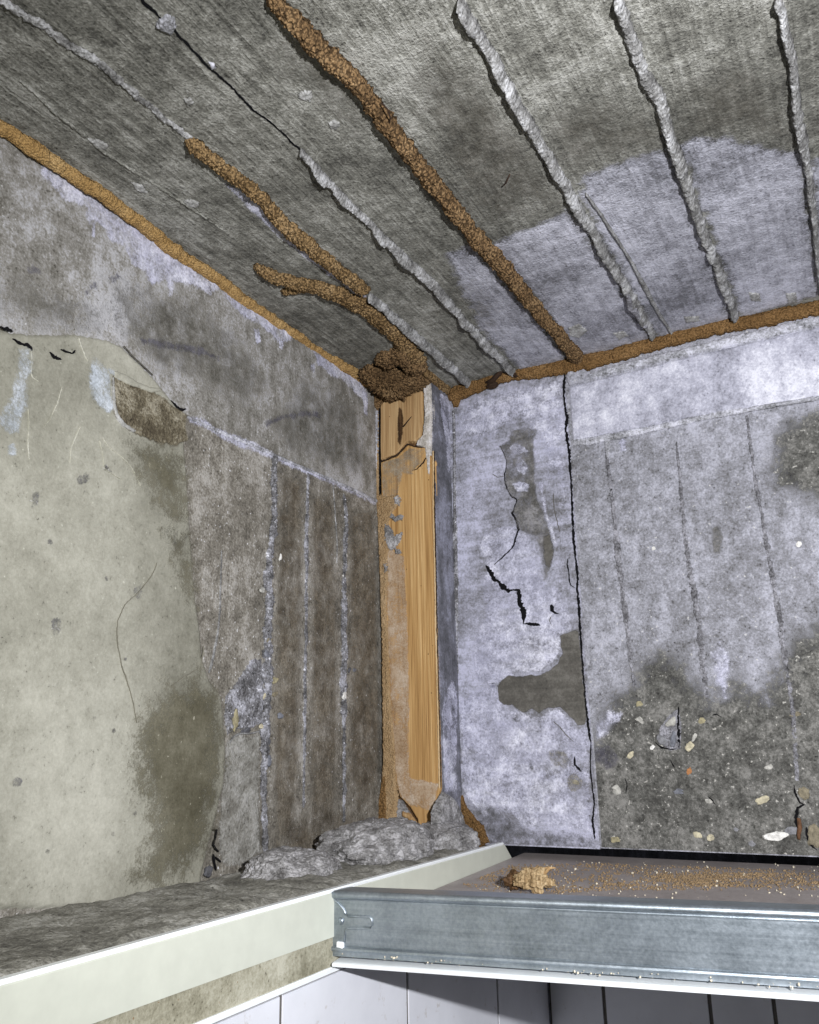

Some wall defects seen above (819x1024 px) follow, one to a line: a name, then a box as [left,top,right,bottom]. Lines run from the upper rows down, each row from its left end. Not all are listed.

crack [141,0,300,150]
damp [494,74,819,354]
damp [448,245,563,369]
spalling [111,371,188,446]
crack [486,448,552,626]
crack [553,374,596,839]
damp [128,668,229,887]
spalling [655,707,682,751]